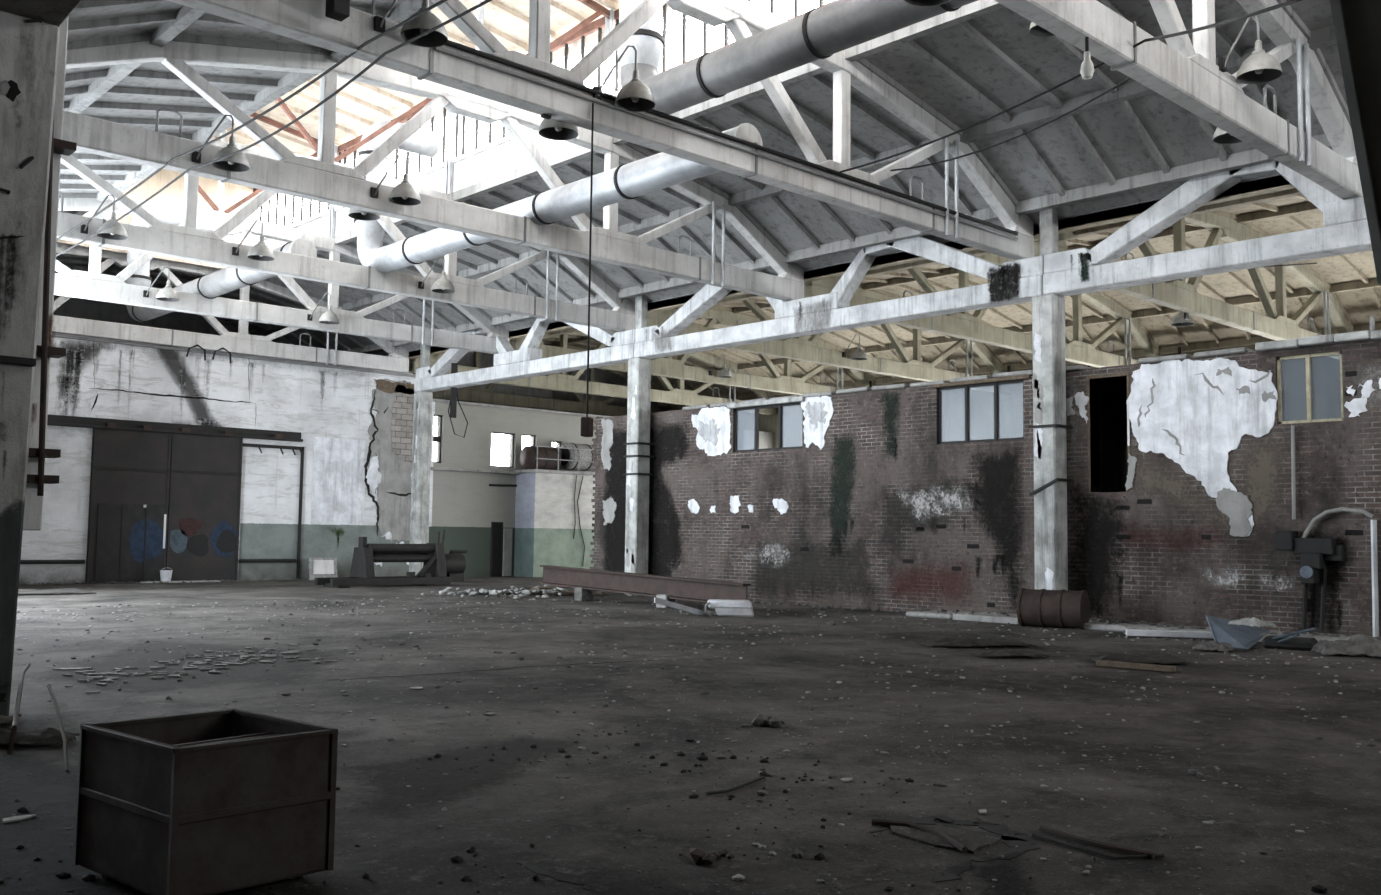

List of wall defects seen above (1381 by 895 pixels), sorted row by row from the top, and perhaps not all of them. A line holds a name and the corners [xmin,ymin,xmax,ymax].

hole [0,80,21,102]
damp [0,235,19,307]
mould [987,263,1020,302]
flaking render [364,379,418,544]
flaking render [691,406,732,456]
flaking render [801,396,834,450]
flaking render [1066,391,1089,423]
flaking render [1116,358,1278,537]
flaking render [1344,360,1381,417]
damp [757,435,870,597]